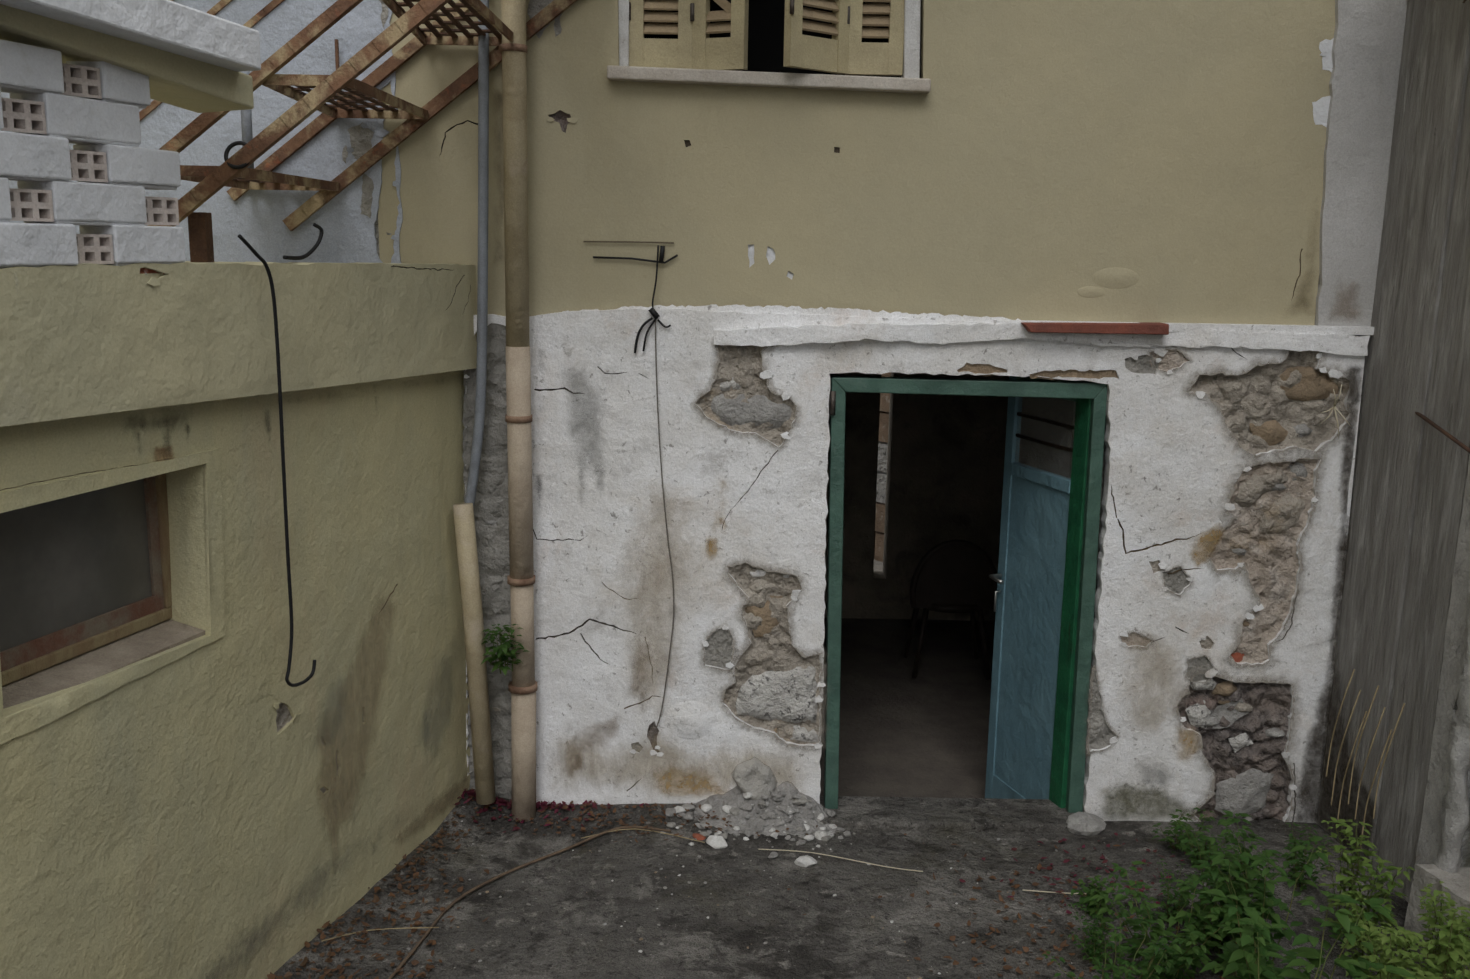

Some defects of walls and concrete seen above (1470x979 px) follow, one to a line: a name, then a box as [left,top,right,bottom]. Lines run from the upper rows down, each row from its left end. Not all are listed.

spalling [694,345,798,448]
spalling [957,363,1007,376]
crack [536,582,663,709]
spalling [700,561,826,749]
crack [1111,486,1202,574]
spalling [1029,348,1354,822]